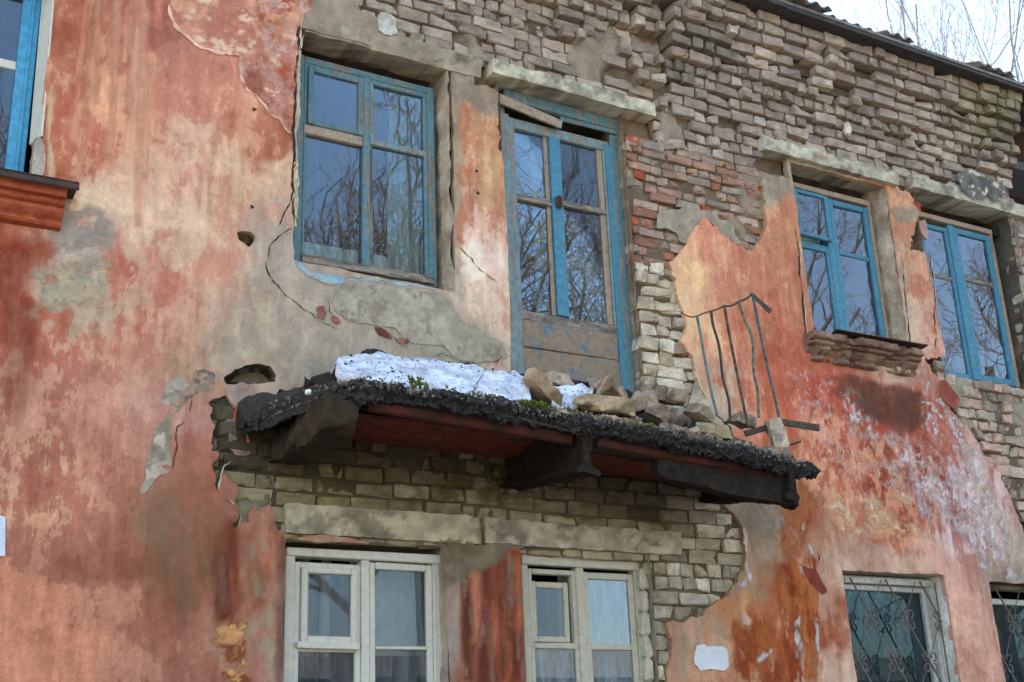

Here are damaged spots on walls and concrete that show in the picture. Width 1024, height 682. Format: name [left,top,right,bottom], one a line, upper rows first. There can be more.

peeling [168,0,311,135]
spalling [237,232,253,247]
crack [265,19,407,347]
spalling [359,0,1024,449]
spalling [140,365,743,682]
damp [788,371,1016,582]
spalling [930,360,1024,522]